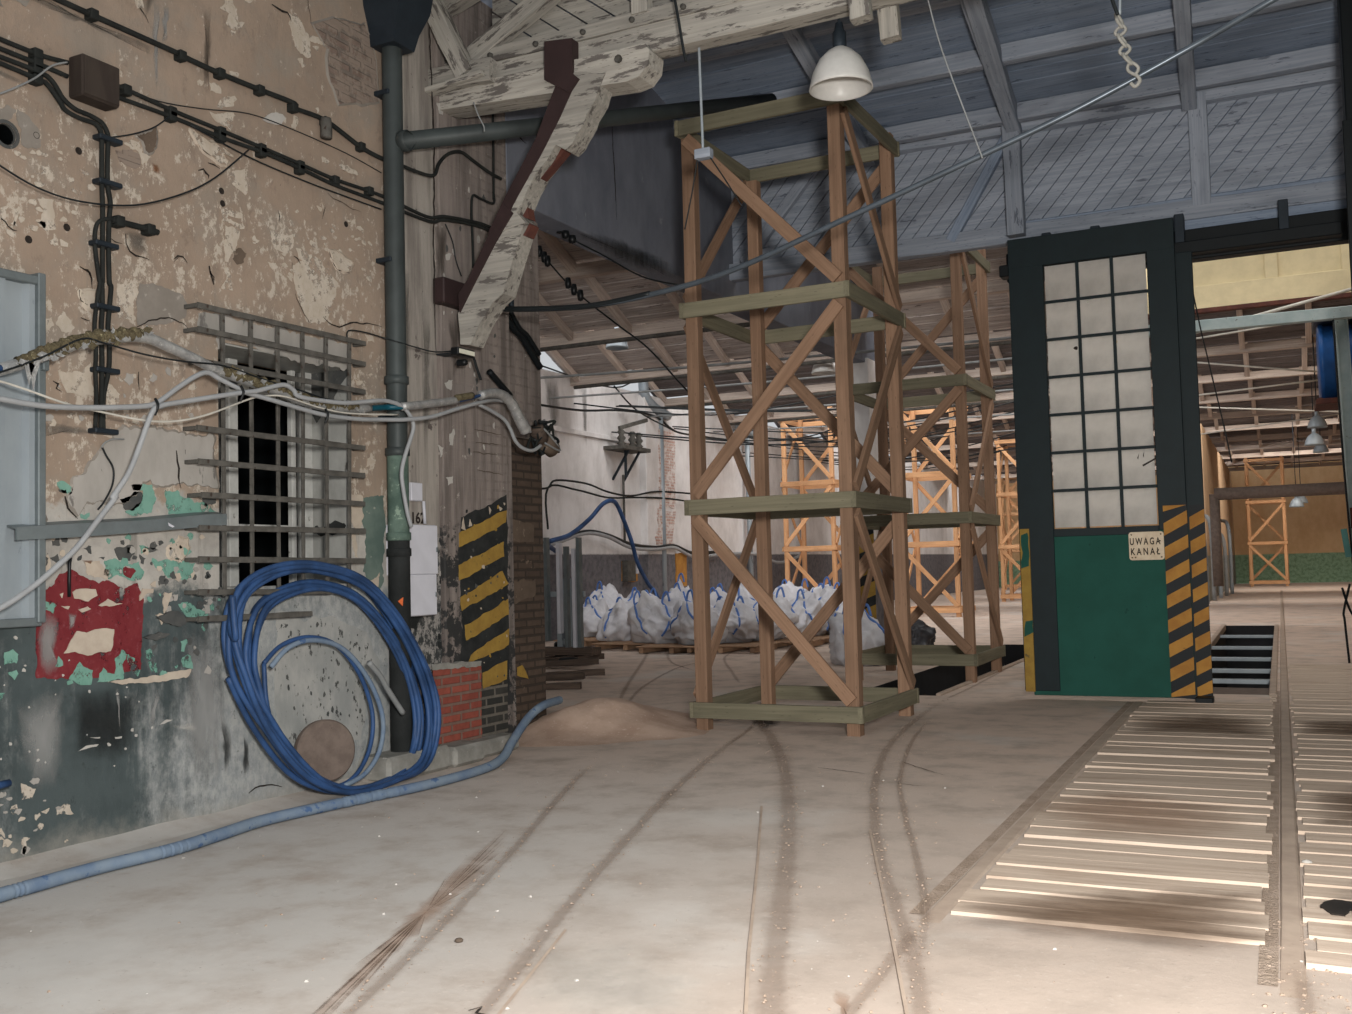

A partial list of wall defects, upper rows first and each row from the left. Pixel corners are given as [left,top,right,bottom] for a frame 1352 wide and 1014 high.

peeling [197,71,239,131]
peeling [220,0,253,36]
flaking render [289,13,380,107]
peeling [0,119,96,247]
flaking render [188,128,373,386]
flaking render [46,362,220,520]
water stain [42,624,55,664]
peeling [46,533,221,702]
water stain [29,704,57,772]
water stain [81,695,127,747]
water stain [192,653,248,768]
peeling [0,778,73,855]